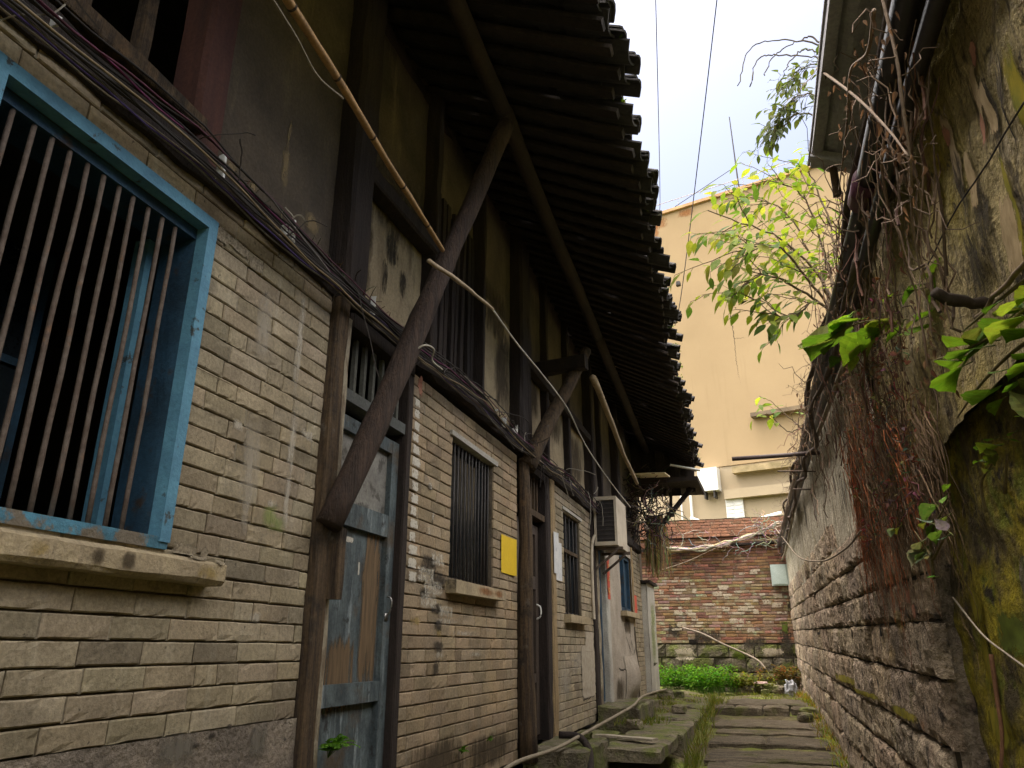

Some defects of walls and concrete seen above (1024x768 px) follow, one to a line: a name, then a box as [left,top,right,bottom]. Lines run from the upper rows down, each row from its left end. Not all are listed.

damp [382,234,406,299]
peeling [408,376,452,614]
peeling [324,533,380,685]